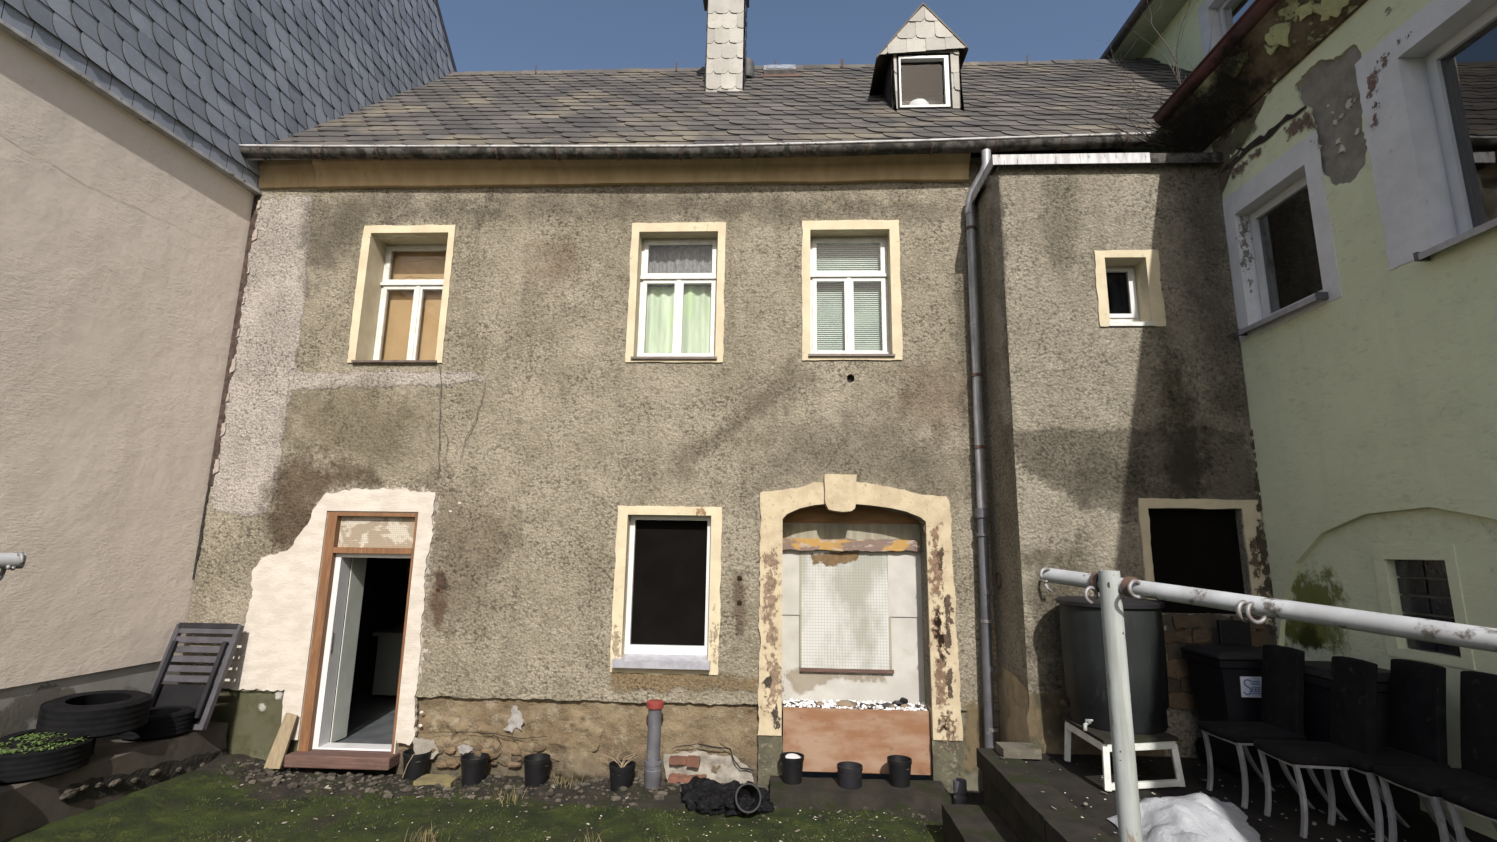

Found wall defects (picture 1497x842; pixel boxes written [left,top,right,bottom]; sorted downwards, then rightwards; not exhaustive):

peeling [1234,0,1350,76]
spalling [1280,31,1412,186]
leakage [268,460,377,550]
peeling [758,547,785,729]
peeling [923,522,959,751]
spalling [431,714,610,770]
spalling [663,751,754,784]